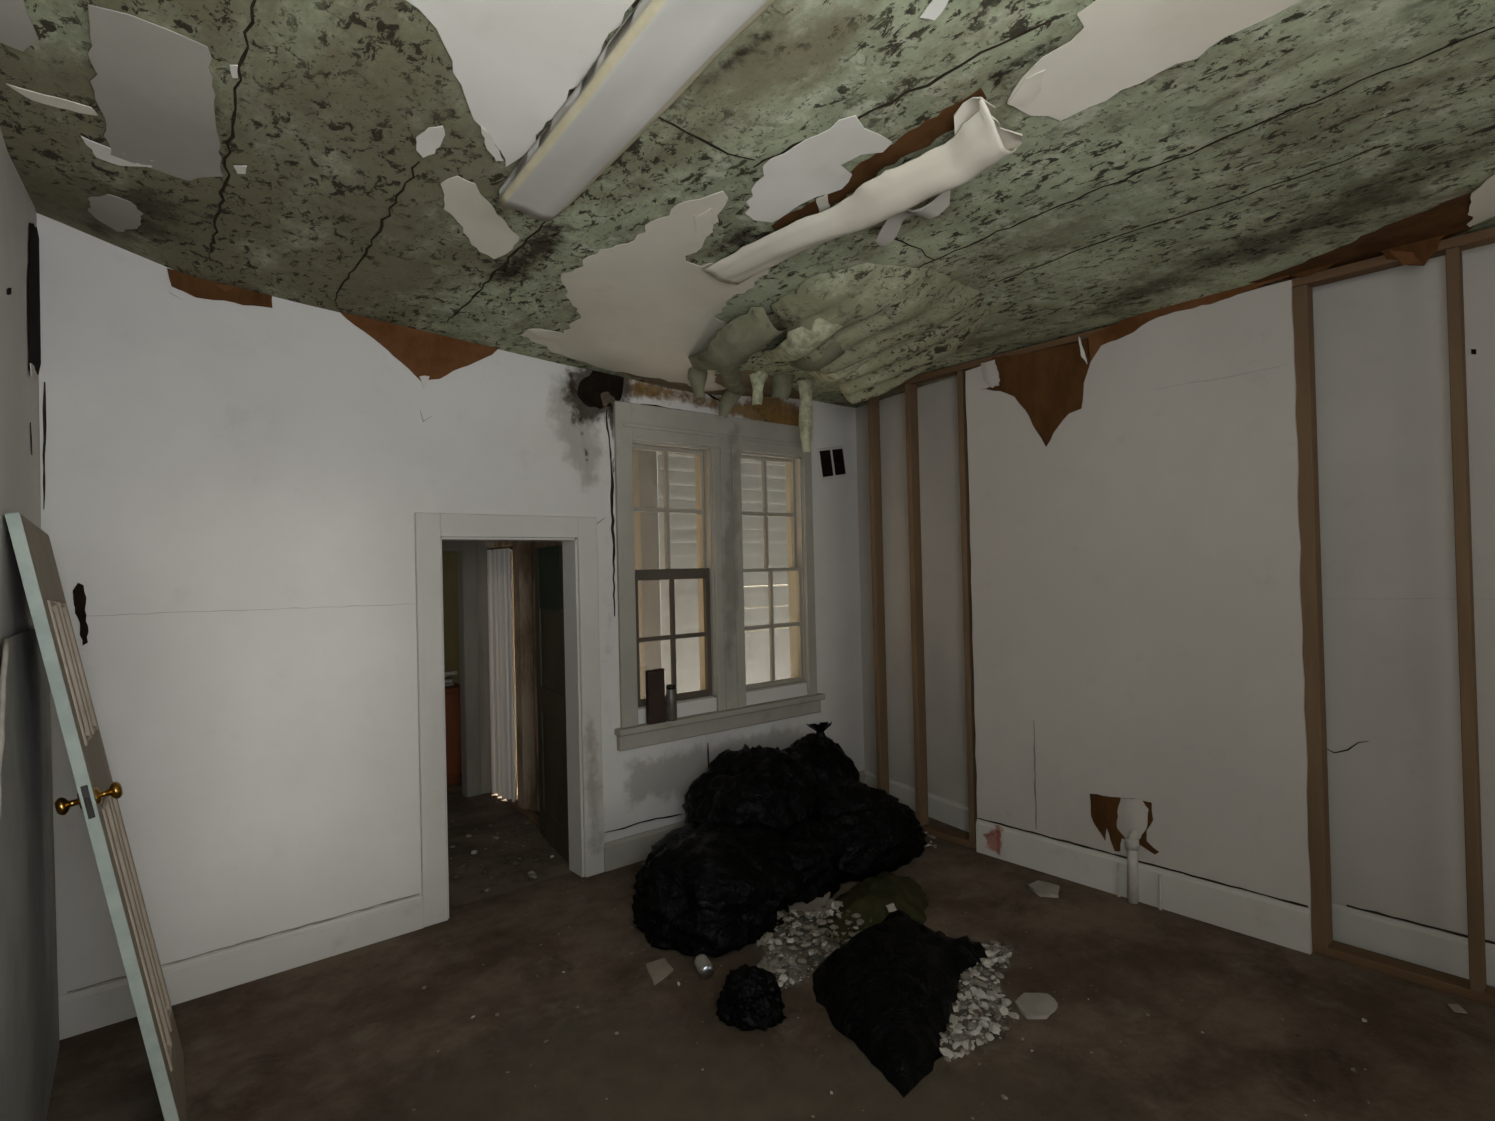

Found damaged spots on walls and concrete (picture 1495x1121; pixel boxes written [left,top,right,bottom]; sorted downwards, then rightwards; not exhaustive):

peeling [6,4,247,181]
crack [208,0,256,259]
peeling [406,0,635,167]
water stain [722,32,772,69]
water stain [991,45,1052,83]
water stain [126,190,172,237]
crack [334,162,420,301]
flaking render [340,312,498,389]
mould [493,225,574,282]
peeling [521,0,1302,452]
flaking render [981,174,1495,446]
mould [1100,147,1481,313]